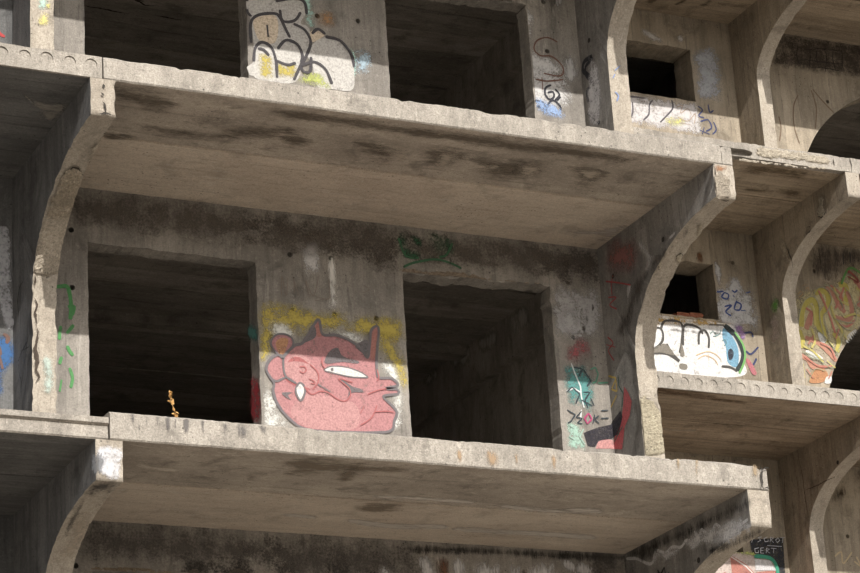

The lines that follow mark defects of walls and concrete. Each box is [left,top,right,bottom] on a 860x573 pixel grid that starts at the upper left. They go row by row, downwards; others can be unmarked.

mould [775,35,860,76]
damp [115,88,177,107]
damp [219,129,311,145]
damp [277,111,629,160]
spalling [739,146,835,169]
spalling [34,144,99,276]
damp [72,196,598,305]
damp [288,461,404,481]
damp [60,495,761,573]